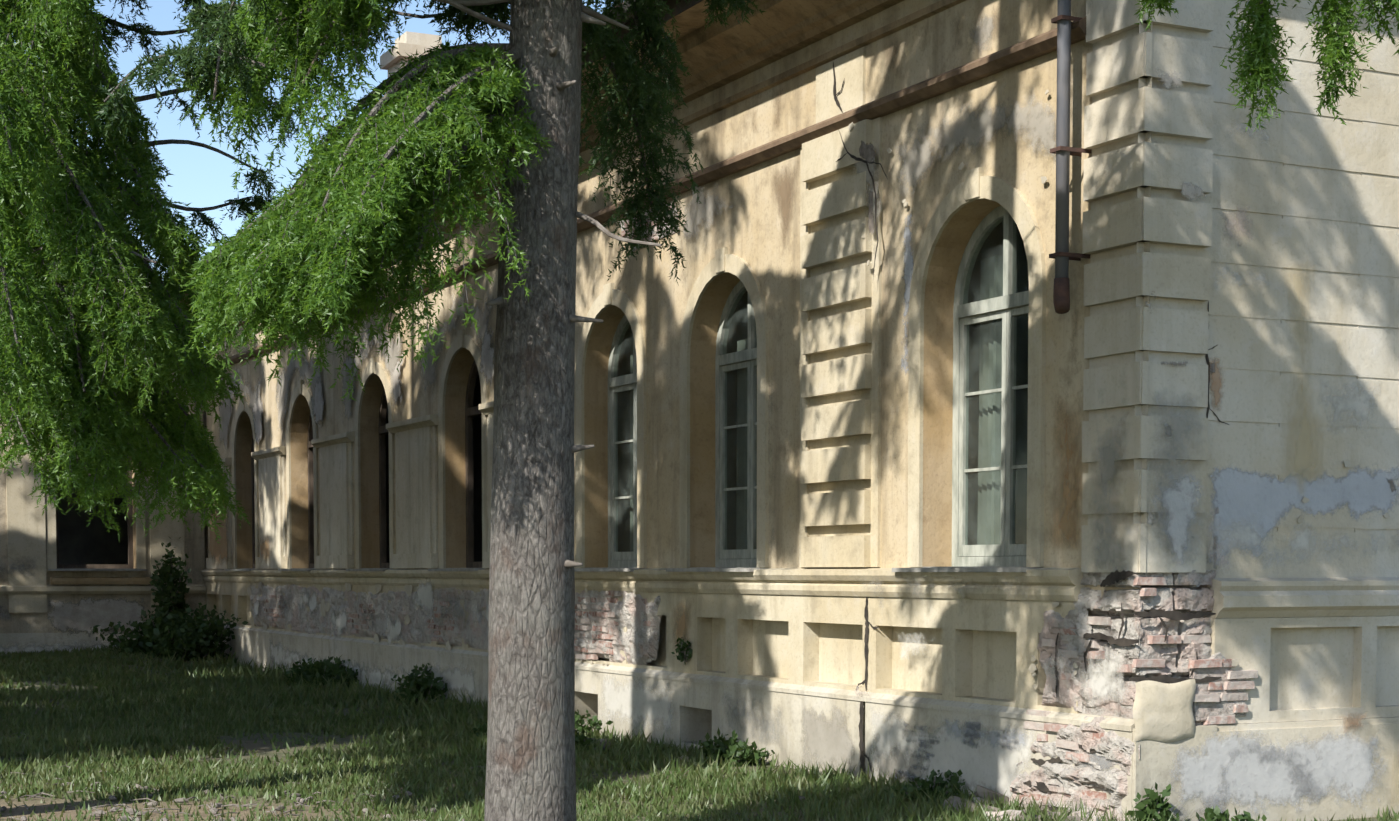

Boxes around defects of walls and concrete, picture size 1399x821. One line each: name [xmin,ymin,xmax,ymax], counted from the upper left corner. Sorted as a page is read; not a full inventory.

crack [833,62,887,277]
crack [1205,345,1229,425]
spalling [247,578,489,669]
peeling [345,663,475,694]
spalling [574,588,672,727]
crack [856,597,878,777]
spalling [873,460,1399,821]